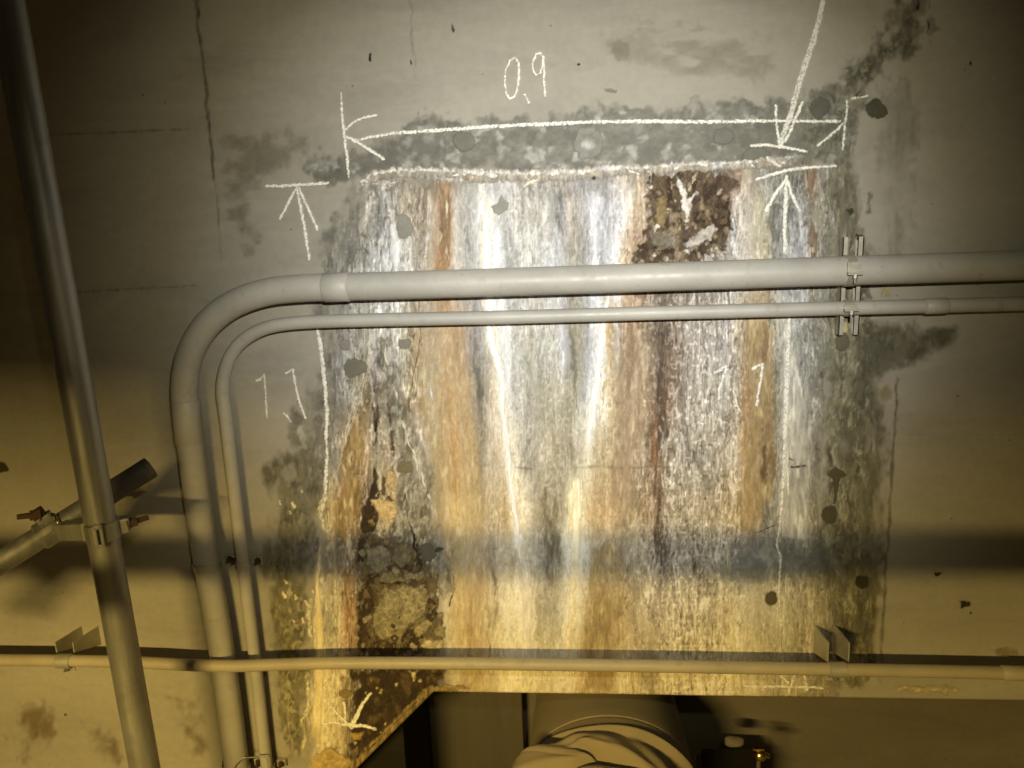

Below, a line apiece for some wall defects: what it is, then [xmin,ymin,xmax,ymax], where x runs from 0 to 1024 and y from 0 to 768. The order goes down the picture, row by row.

leakage [308,0,919,273]
corrosion [440,186,450,260]
spalling [627,170,737,264]
leakage [339,286,865,314]
corrosion [335,411,364,538]
corrosion [602,326,670,458]
corrosion [736,317,775,533]
leakage [263,315,955,768]
spalling [349,469,469,758]